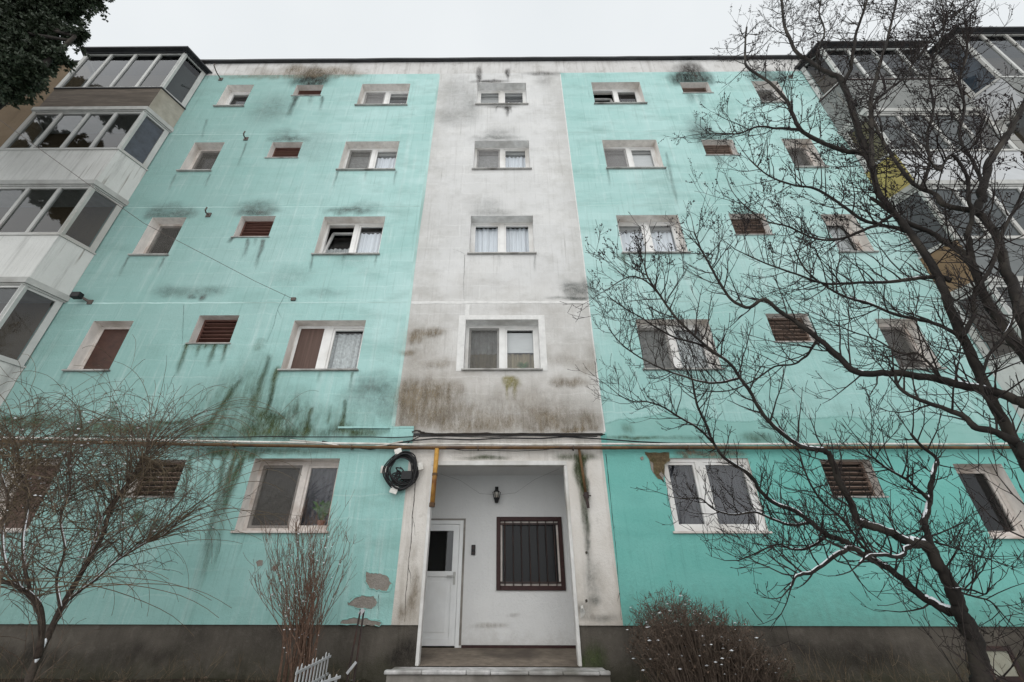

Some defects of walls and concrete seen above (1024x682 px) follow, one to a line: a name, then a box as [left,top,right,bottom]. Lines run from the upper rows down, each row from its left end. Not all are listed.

damp [406,329,441,354]
damp [253,368,278,412]
damp [398,381,514,431]
peeling [640,452,670,480]
flaking render [339,571,393,627]